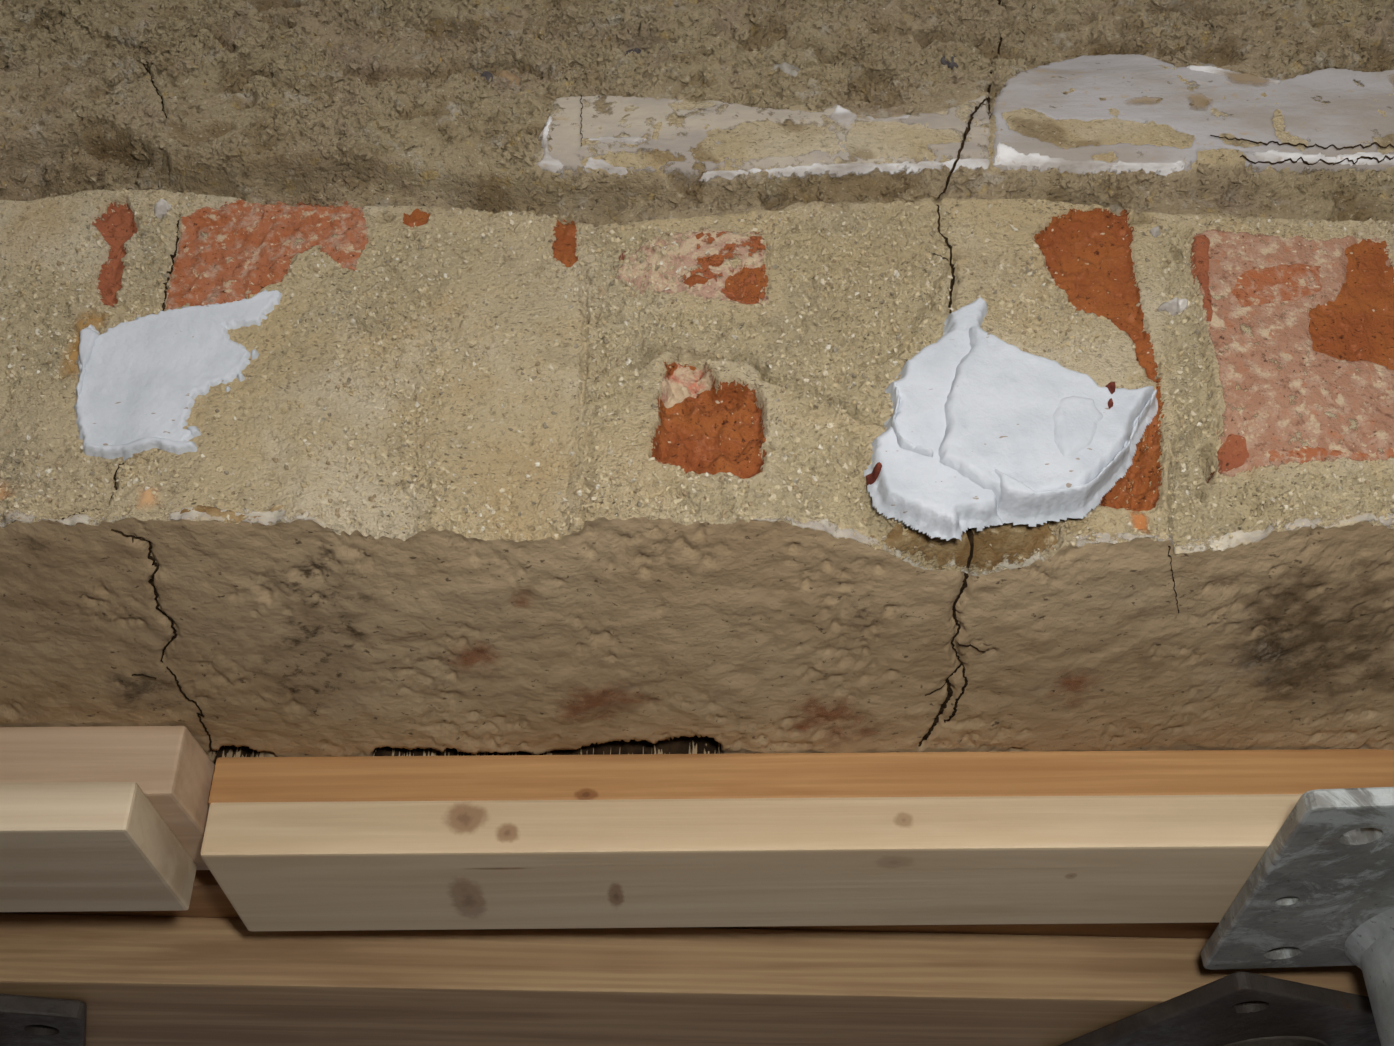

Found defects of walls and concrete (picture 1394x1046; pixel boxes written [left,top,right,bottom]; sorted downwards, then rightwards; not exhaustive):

leakage [68,317,103,372]
crack [162,219,180,311]
spalling [165,199,369,310]
spalling [651,362,767,479]
peeling [535,54,1394,182]
crack [929,0,1002,314]
spalling [1034,208,1164,512]
peeling [1190,229,1394,483]
crack [61,463,212,751]
crack [919,528,986,747]